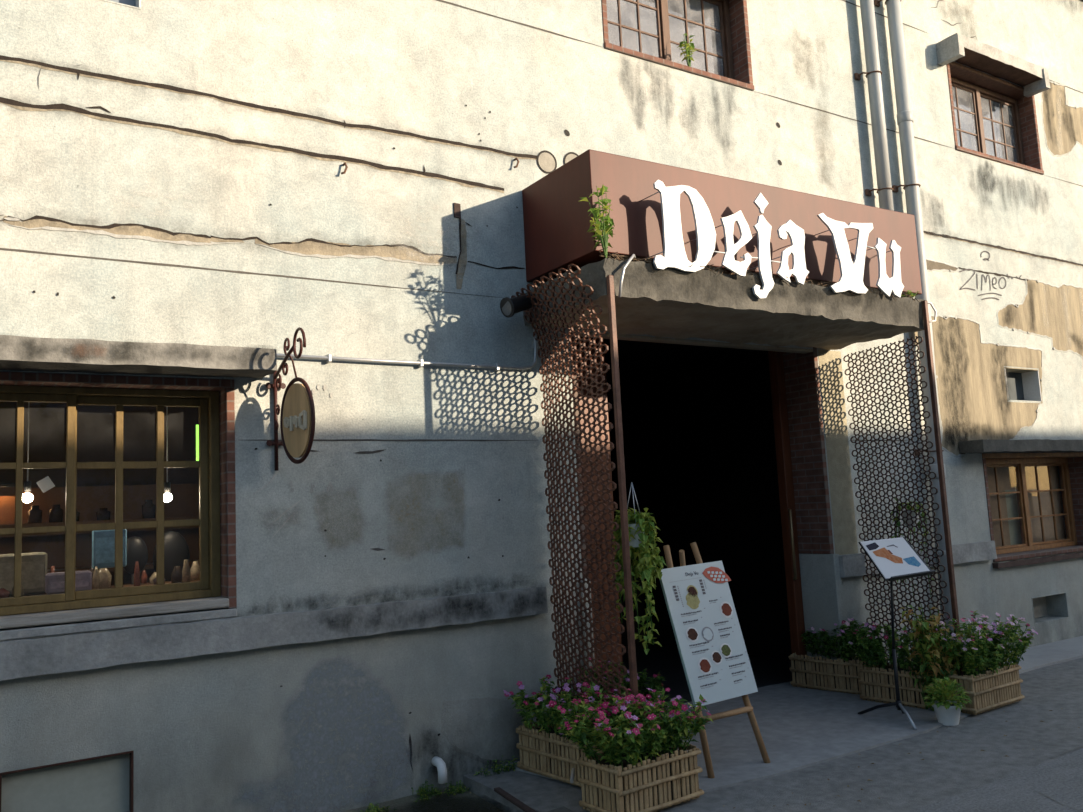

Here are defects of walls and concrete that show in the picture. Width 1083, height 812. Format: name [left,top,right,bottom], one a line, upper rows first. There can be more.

crack [0,55,537,289]
flaking render [1040,80,1083,157]
flaking render [931,277,1083,457]